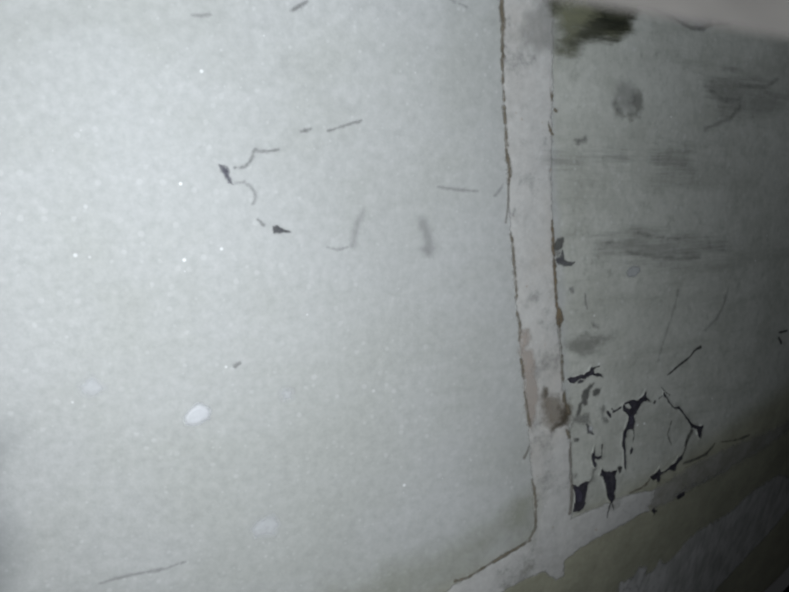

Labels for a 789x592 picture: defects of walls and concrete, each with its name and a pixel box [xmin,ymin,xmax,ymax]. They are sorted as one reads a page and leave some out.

damp [553,0,635,54]
corrosion [551,220,563,337]
peeling [564,363,605,386]
peeling [570,388,652,517]